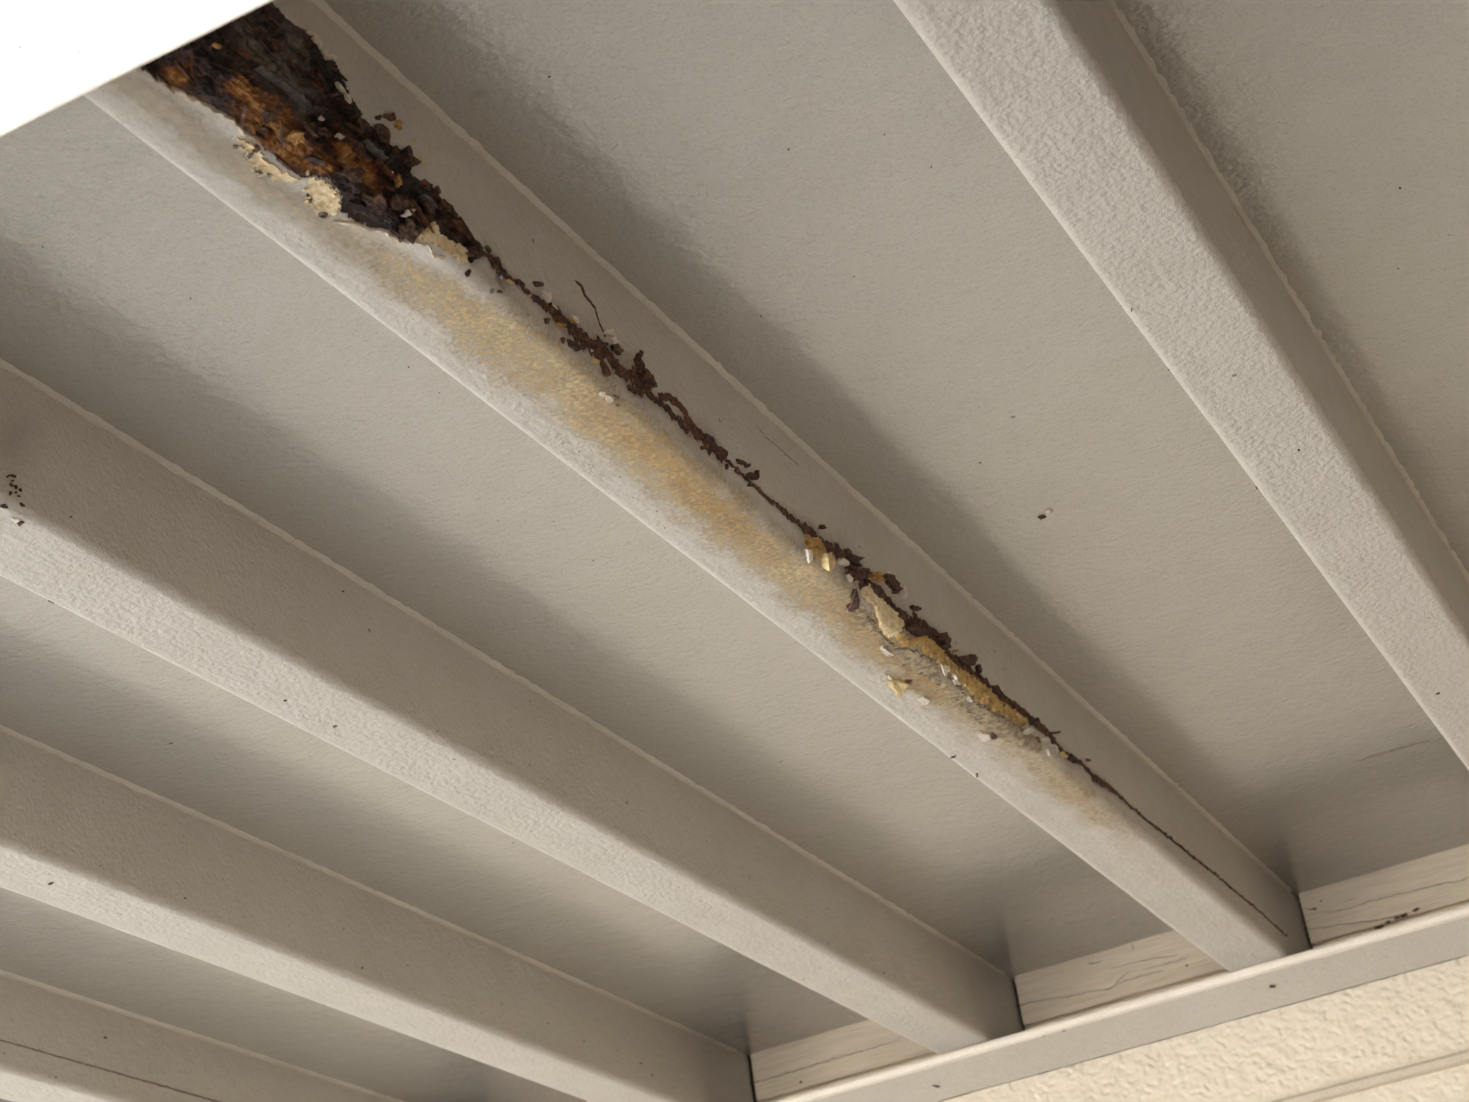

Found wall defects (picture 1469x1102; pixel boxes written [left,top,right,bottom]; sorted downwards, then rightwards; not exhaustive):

rust [111,75,307,218]
rust [357,242,981,725]
peeling [804,524,1091,764]